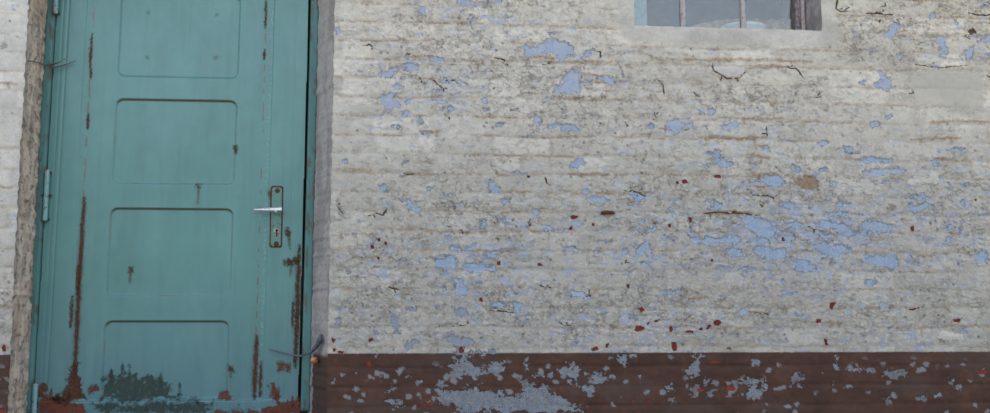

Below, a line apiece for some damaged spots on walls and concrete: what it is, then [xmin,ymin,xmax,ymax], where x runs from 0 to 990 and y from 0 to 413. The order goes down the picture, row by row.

crack [835,0,893,23]
peeling [519,32,624,139]
crack [712,63,746,81]
spalling [758,165,838,191]
corrosion [37,198,100,413]
corrosion [277,227,301,373]
peeling [434,235,501,317]
peeling [690,200,900,311]
corrosion [214,336,301,413]
peeling [421,334,611,413]
peeling [684,353,768,401]
peeling [824,339,908,388]